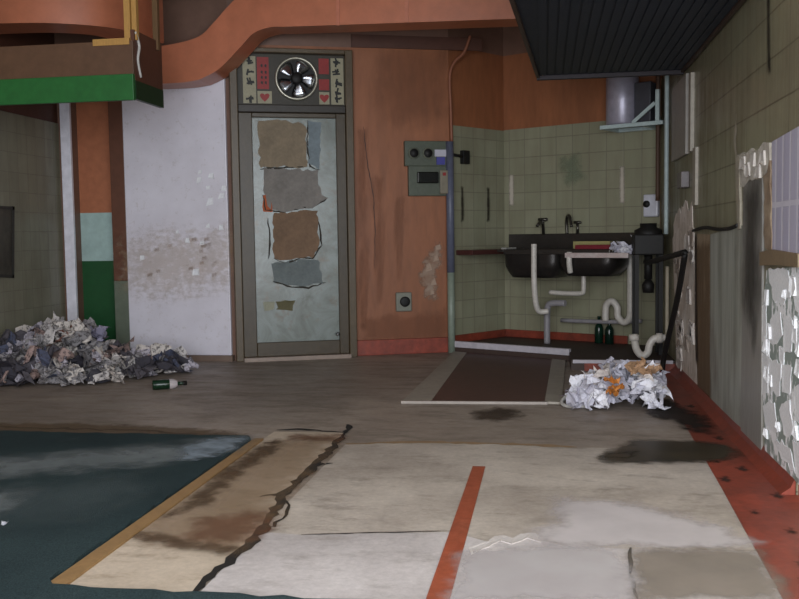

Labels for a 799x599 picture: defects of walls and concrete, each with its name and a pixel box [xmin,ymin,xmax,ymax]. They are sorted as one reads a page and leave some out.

peeling [419,244,441,299]
damp [471,408,519,420]
flaking render [672,200,697,384]
peeling [762,267,799,484]
crack [193,424,573,591]